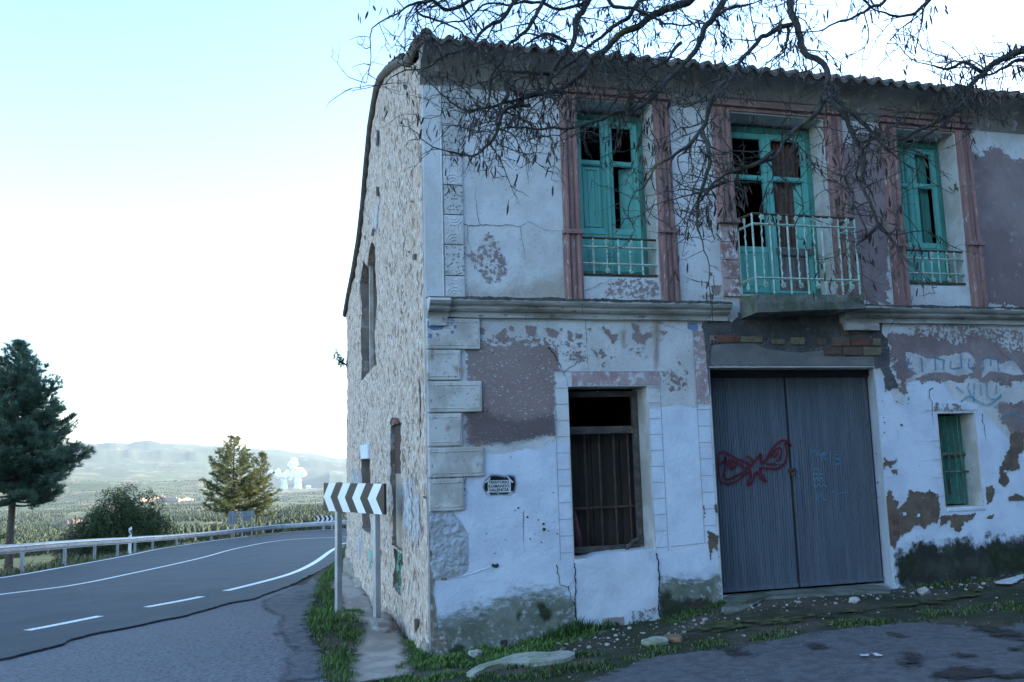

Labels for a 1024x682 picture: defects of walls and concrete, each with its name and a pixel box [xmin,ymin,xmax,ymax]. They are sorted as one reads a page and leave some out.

crack [463,199,556,256]
peeling [972,146,1024,308]
peeling [464,232,508,284]
peeling [605,278,659,299]
peeling [463,323,668,447]
peeling [660,361,688,392]
peeling [824,324,1024,404]
spalling [877,400,1024,549]
spalling [414,511,469,655]
crack [556,563,577,622]
damp [894,533,1024,589]